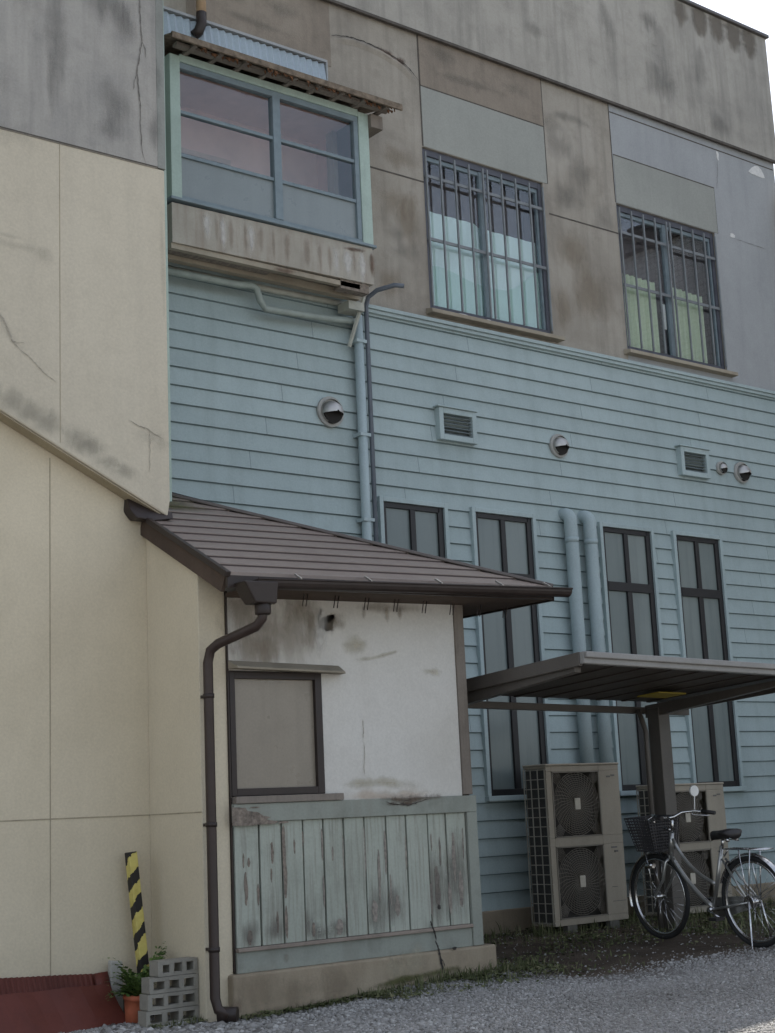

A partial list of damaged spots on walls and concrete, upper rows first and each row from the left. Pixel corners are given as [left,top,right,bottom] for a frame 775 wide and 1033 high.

crack [134,0,146,164]
crack [332,35,417,78]
damp [676,4,754,56]
crack [0,315,56,382]
peeling [363,827,400,922]
peeling [430,834,441,915]
crack [430,921,445,973]